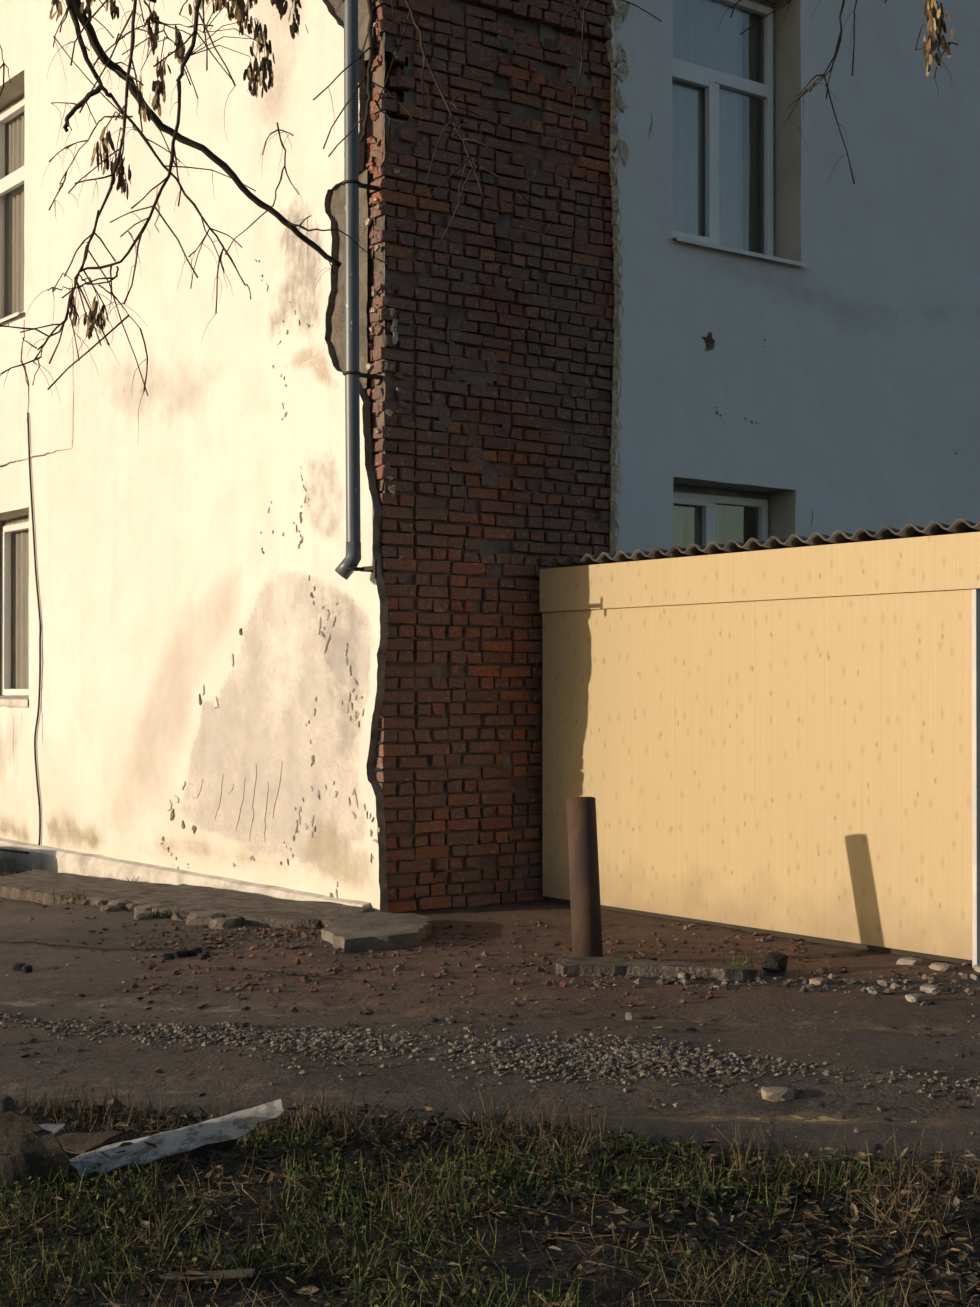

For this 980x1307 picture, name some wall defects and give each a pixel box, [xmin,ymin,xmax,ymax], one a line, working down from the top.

crack [20,333,29,422]
spalling [702,332,715,350]
spalling [277,0,630,913]
crack [38,625,46,739]